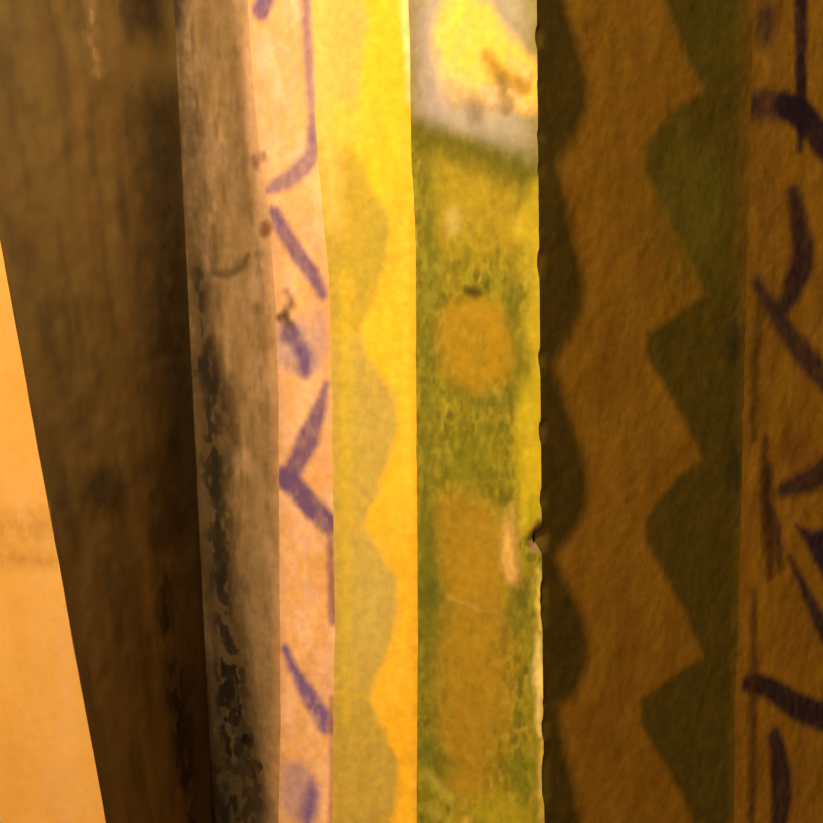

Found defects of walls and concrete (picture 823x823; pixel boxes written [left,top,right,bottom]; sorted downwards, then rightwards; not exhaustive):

water stain [198,338,262,823]